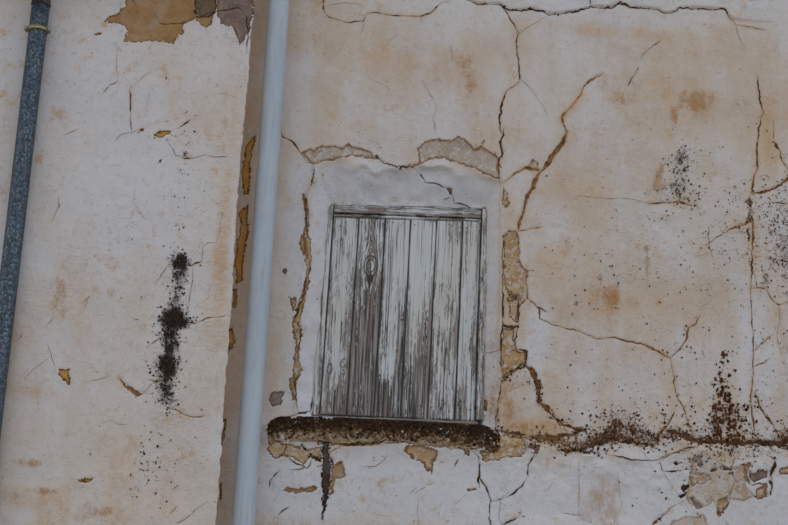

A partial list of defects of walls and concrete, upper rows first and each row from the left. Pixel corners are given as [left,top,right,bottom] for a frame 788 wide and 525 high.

peeling [105,0,254,45]
leakage [145,239,203,416]
peeling [269,194,312,407]
crack [290,257,313,417]
crack [375,155,470,208]
crack [453,0,788,525]
leakage [644,139,788,313]
leakage [130,425,192,510]
crack [269,438,398,487]
flaking render [267,432,559,521]
leakage [484,346,788,488]
peeling [670,454,768,525]